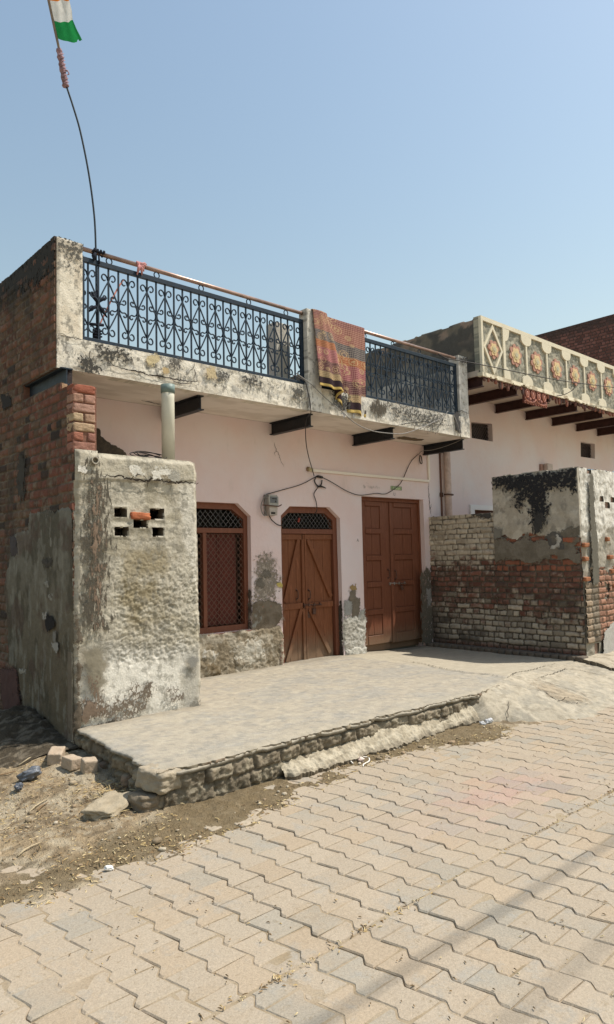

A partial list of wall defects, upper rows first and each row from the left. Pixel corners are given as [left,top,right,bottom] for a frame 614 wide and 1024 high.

damp [78,344,134,374]
damp [216,368,264,387]
damp [293,386,311,407]
crack [103,474,198,487]
spalling [494,526,589,564]
damp [491,468,600,586]
spalling [199,552,285,678]
spalling [342,584,367,655]